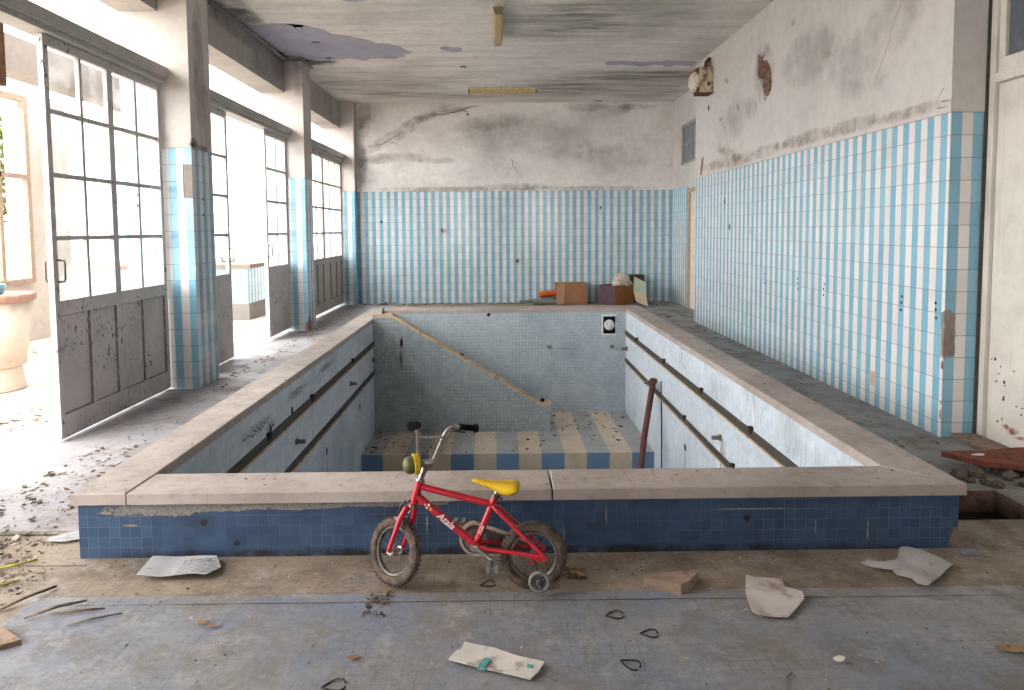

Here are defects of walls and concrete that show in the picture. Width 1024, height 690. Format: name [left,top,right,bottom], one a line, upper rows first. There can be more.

peeling [240,22,413,61]
peeling [605,57,711,67]
flaking render [756,51,772,101]
peeling [940,310,956,369]
peeling [97,501,449,530]